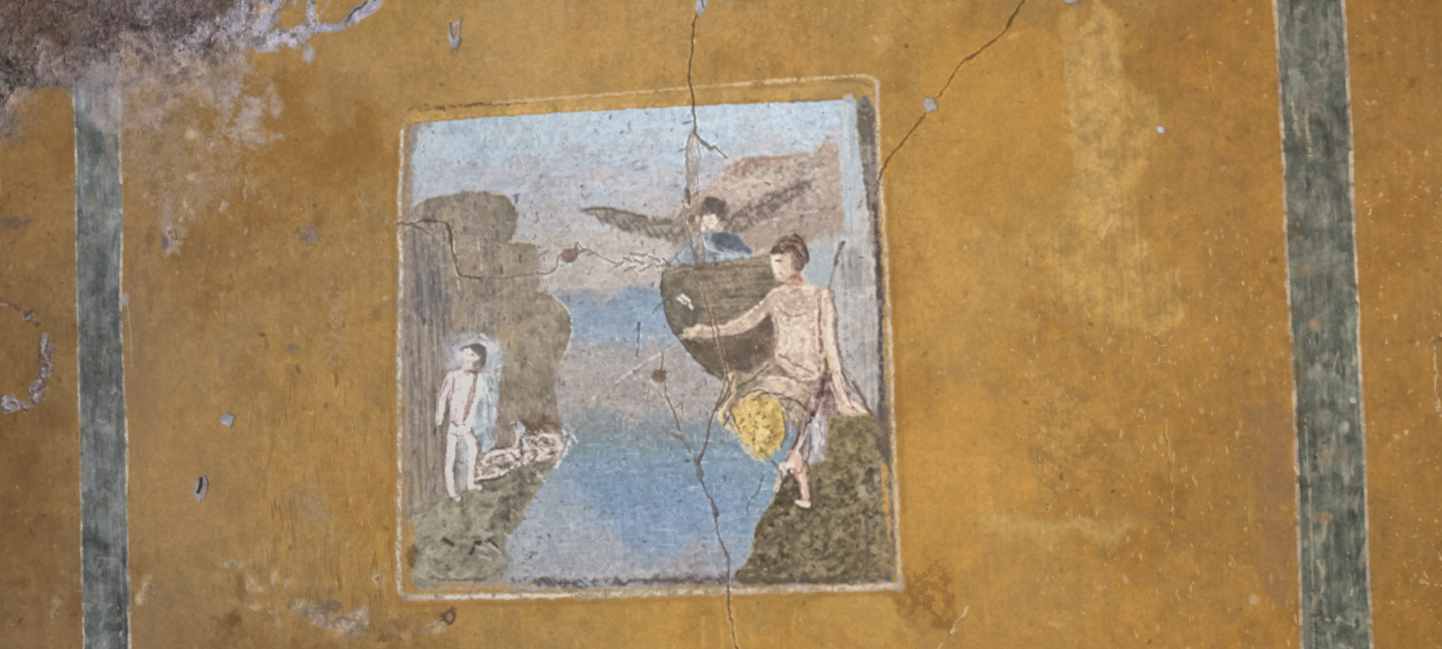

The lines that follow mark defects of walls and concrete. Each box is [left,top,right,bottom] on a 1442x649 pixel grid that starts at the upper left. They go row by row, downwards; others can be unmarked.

flaking render [446,16,463,54]
crack [874,0,1026,196]
flaking render [161,217,183,256]
peeling [0,298,58,415]
crack [358,12,767,649]
flaking render [191,474,210,503]